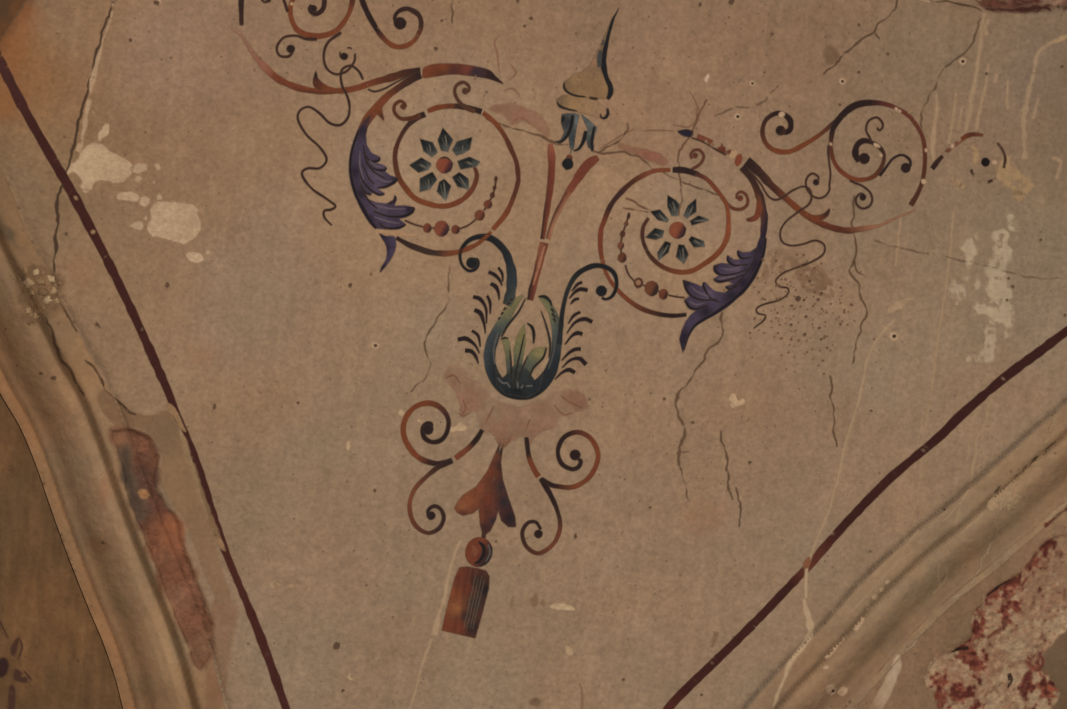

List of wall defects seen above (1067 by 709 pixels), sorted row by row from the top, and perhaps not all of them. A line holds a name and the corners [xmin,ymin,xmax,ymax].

crack [824,0,980,74]
crack [53,0,114,274]
peeling [66,124,210,263]
crack [594,129,648,164]
crack [677,100,717,215]
crack [675,313,724,495]
crack [721,434,741,526]
flaking render [924,502,1067,709]